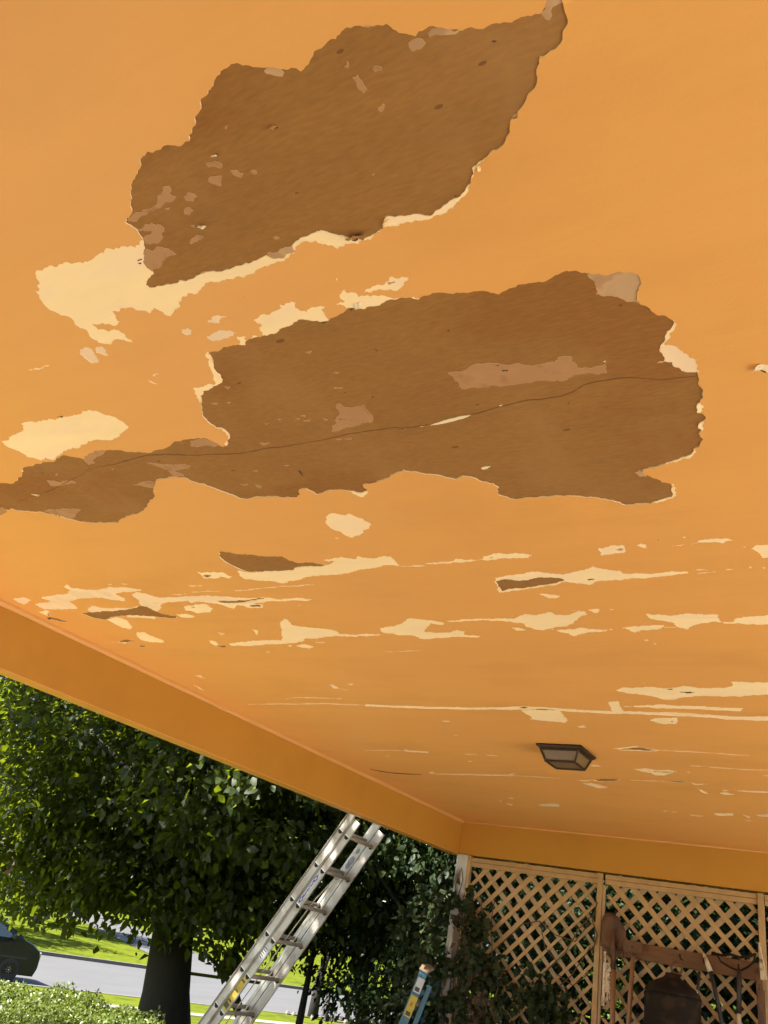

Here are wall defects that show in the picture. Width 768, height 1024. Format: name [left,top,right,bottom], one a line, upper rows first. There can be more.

peeling [35,0,568,363]
peeling [0,271,706,523]
crack [470,376,694,415]
crack [20,424,430,501]
peeling [325,513,371,539]
peeling [14,551,531,647]
peeling [495,567,732,598]
peeling [209,609,613,653]
peeling [626,613,768,644]
peeling [268,682,768,728]